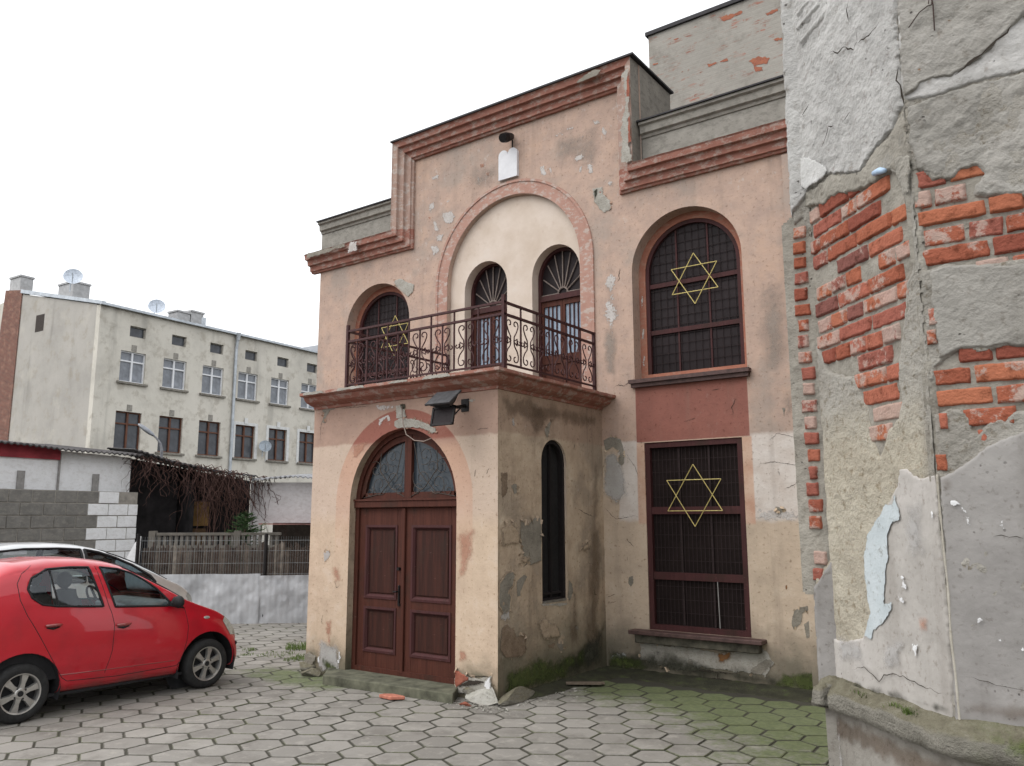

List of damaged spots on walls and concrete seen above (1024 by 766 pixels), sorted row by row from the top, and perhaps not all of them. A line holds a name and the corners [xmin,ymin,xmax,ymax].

crack [831,5,877,54]
peeling [750,56,770,72]
crack [895,70,904,104]
spalling [800,157,827,189]
spalling [593,181,612,212]
peeling [603,274,619,371]
spalling [376,403,437,434]
spalling [757,166,1024,639]
spalling [604,435,626,502]
spalling [498,515,544,658]
crack [858,667,939,694]